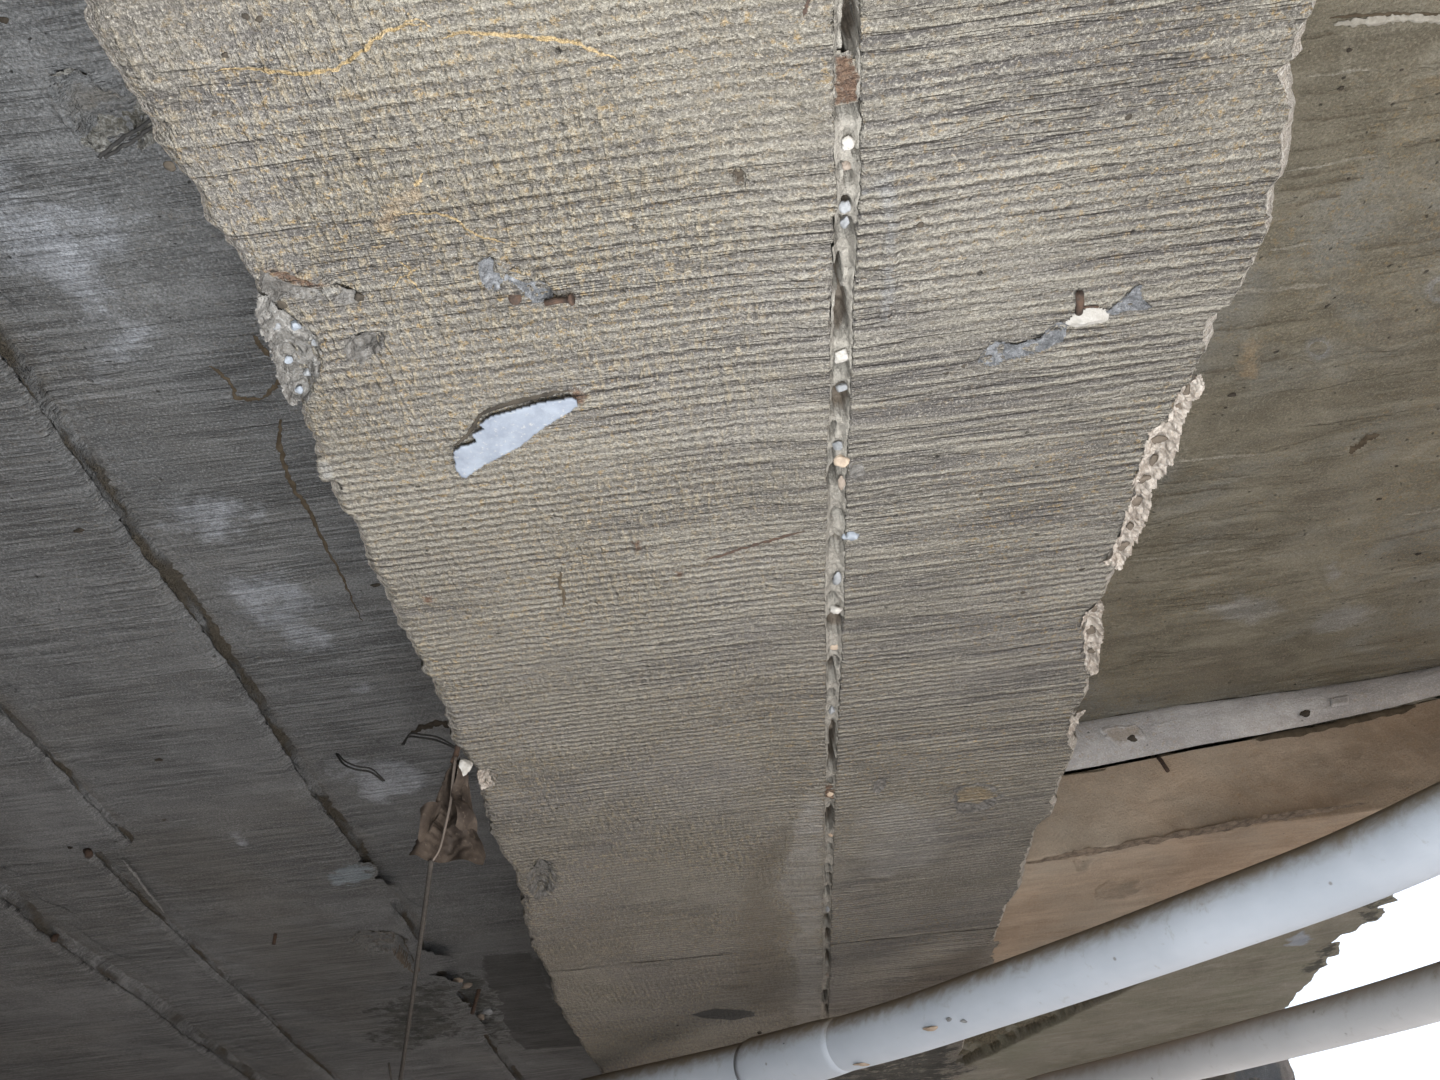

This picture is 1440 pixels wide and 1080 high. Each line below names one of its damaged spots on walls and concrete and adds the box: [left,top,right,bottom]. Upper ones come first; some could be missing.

spalling [40,67,156,152]
spalling [255,259,365,406]
spalling [344,331,386,364]
spalling [978,322,1069,366]
crack [209,335,363,621]
peeling [452,385,591,479]
crack [704,0,902,1019]
spalling [1103,374,1205,571]
spalling [1080,600,1104,676]
spalling [1067,709,1086,738]
spalling [477,769,497,790]